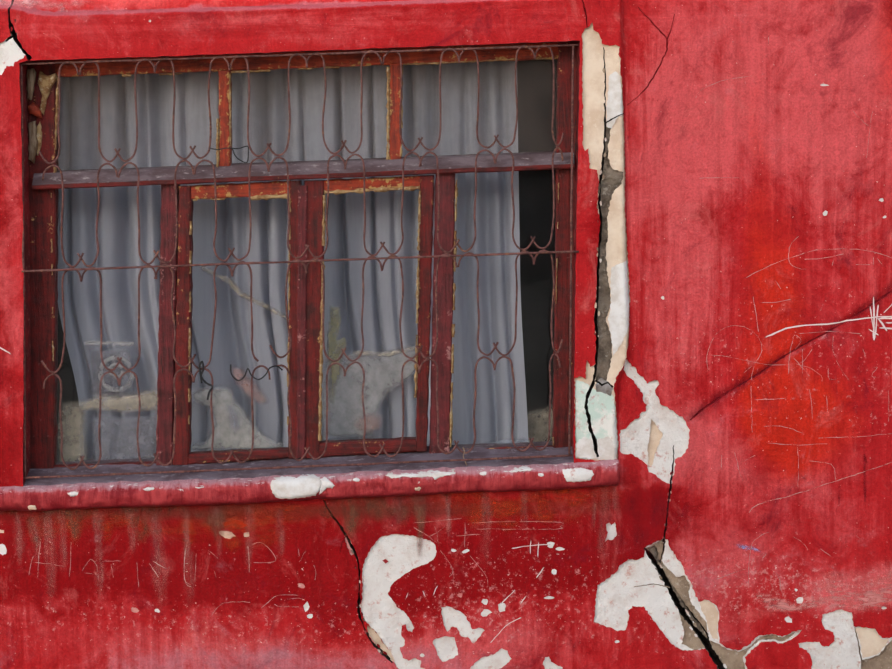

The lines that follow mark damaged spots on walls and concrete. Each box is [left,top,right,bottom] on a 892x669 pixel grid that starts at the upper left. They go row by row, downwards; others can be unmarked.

peeling [0,38,25,75]
crack [6,0,32,61]
crack [584,7,675,457]
peeling [608,261,630,355]
peeling [562,360,690,484]
spalling [270,474,335,499]
crack [322,499,393,663]
peeling [361,534,437,669]
peeling [433,606,485,662]
peeling [470,648,511,669]
crack [634,445,727,669]
peeling [594,539,892,669]